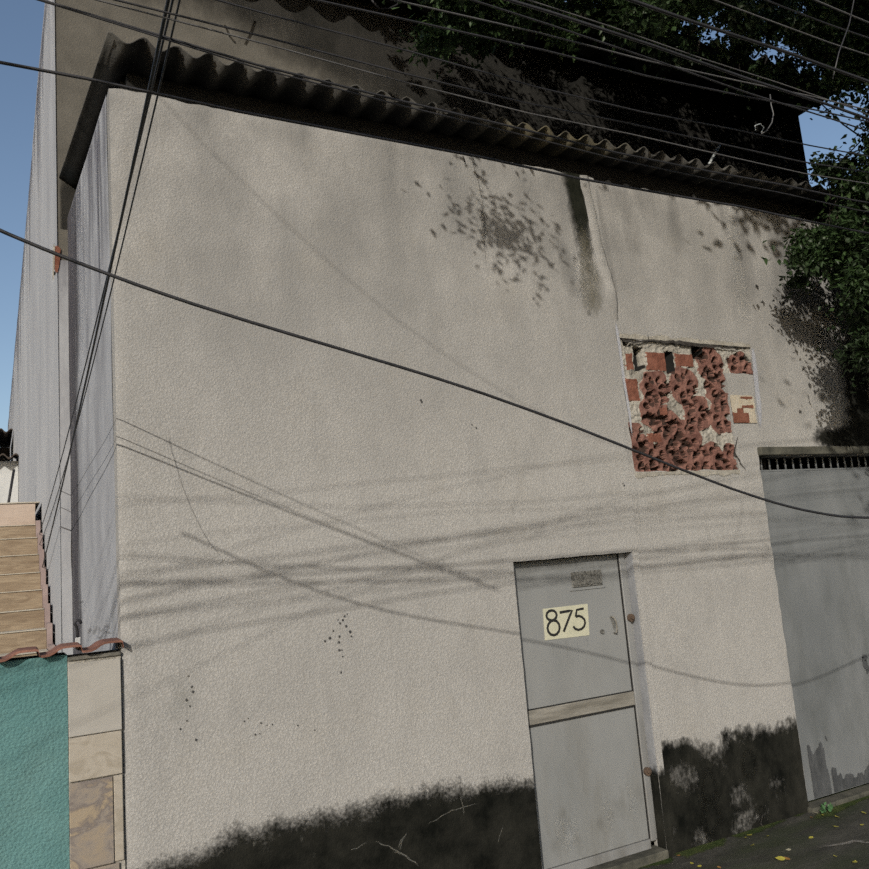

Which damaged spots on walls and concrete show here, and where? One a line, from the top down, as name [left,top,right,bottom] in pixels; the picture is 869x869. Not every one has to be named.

leakage [564,172,591,254]
flaking render [616,325,762,431]
flaking render [634,470,740,479]
leakage [148,780,542,869]
leakage [650,719,809,857]